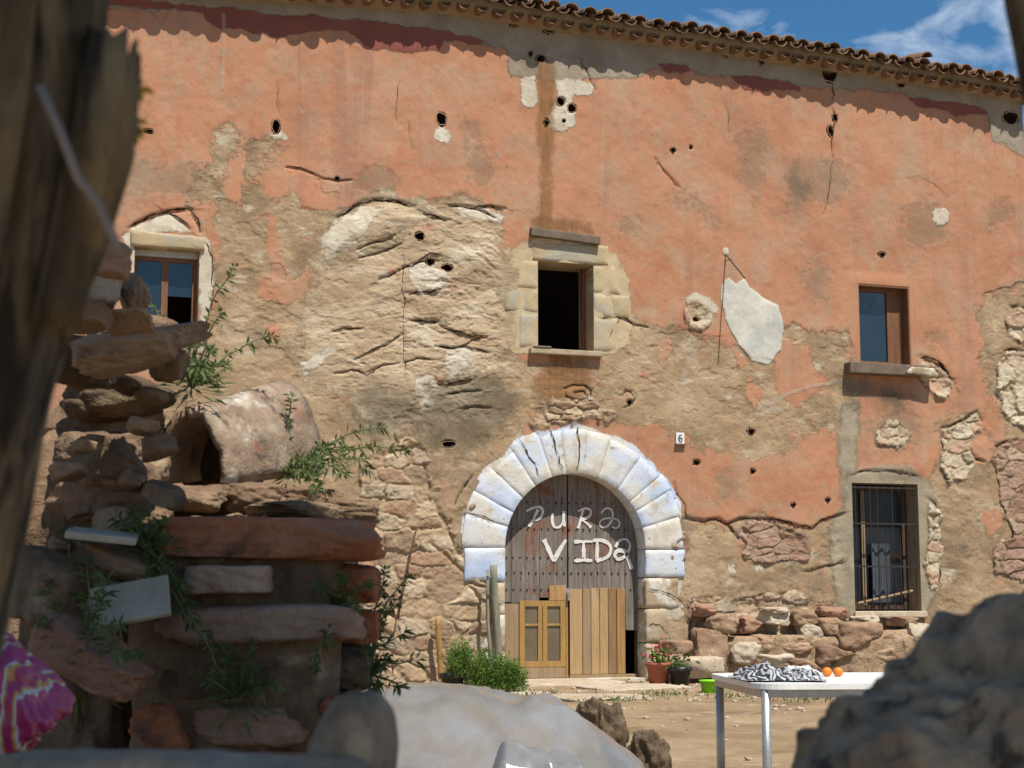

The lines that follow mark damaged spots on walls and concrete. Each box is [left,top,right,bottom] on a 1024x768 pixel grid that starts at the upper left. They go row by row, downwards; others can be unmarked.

spalling [556,97,576,123]
crack [129,208,214,311]
peeling [157,119,863,549]
crack [517,427,580,474]
peeling [916,277,1024,624]
peeling [650,509,844,657]